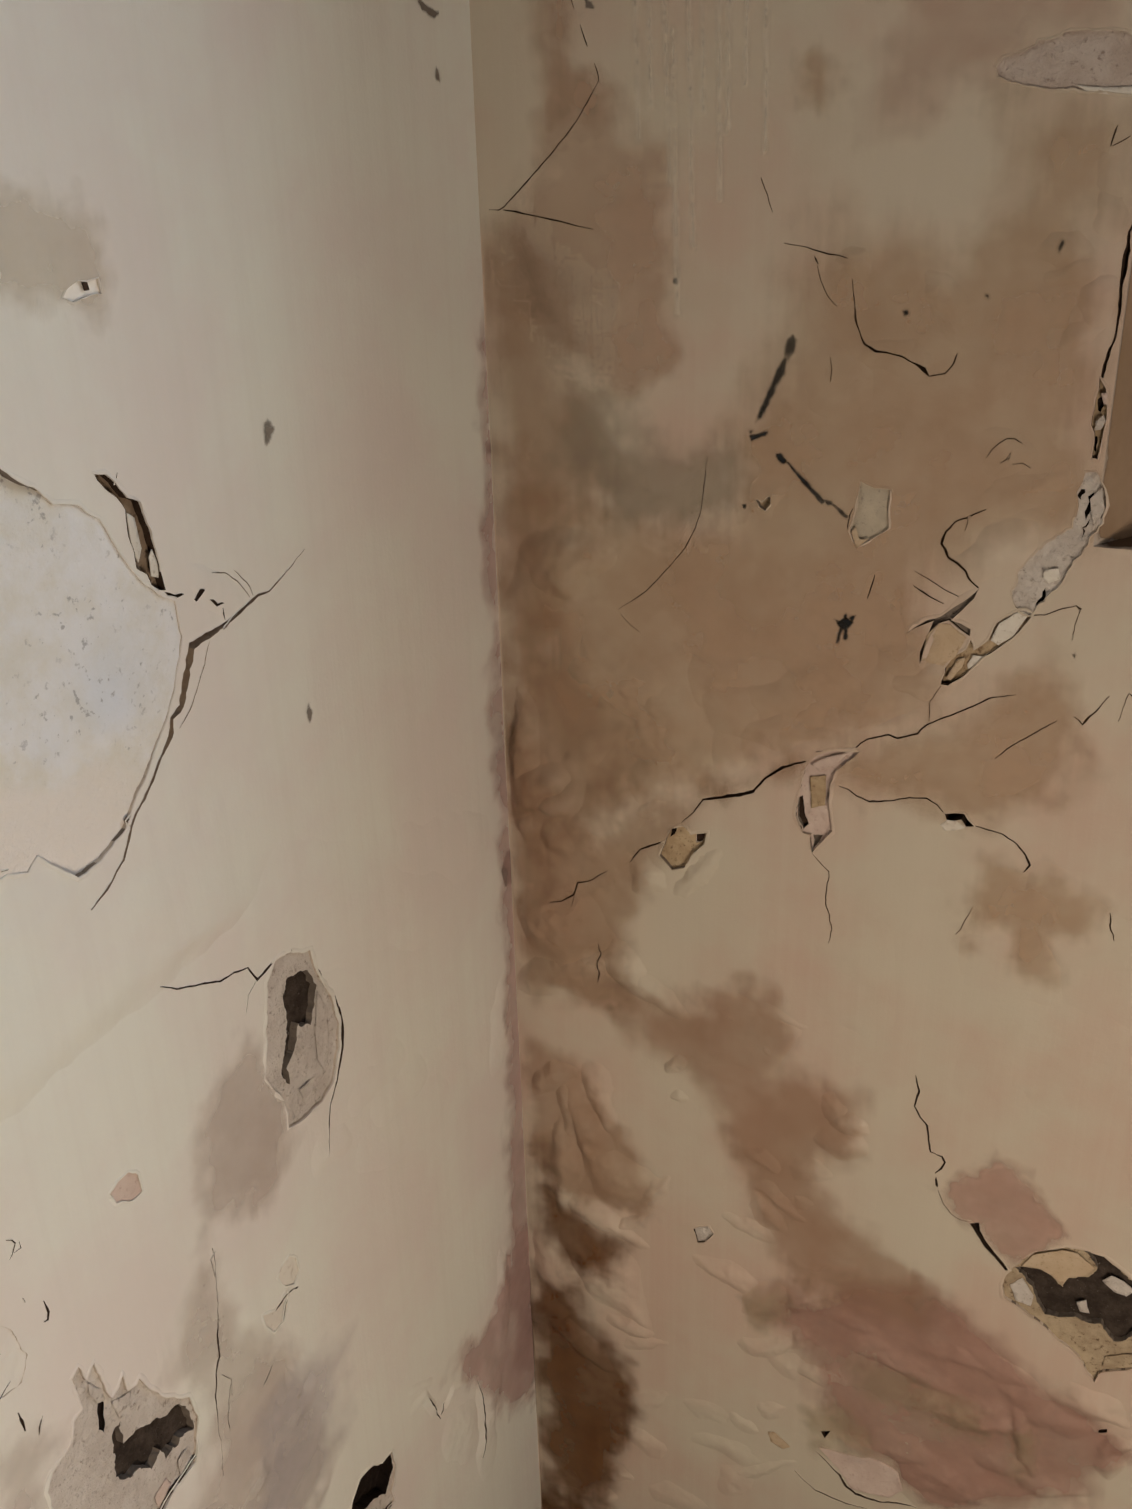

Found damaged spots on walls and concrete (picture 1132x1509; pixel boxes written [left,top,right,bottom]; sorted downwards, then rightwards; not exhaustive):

water stain [750,336,796,441]
water stain [1099,269,1132,539]
spalling [0,464,184,884]
crack [549,686,1032,908]
water stain [776,453,847,517]
crack [913,509,986,604]
crack [1034,605,1082,641]
crack [995,692,1132,759]
spalling [968,1221,1132,1385]
spalling [43,1359,200,1509]
spalling [350,1449,398,1509]
water stain [777,1288,1123,1508]